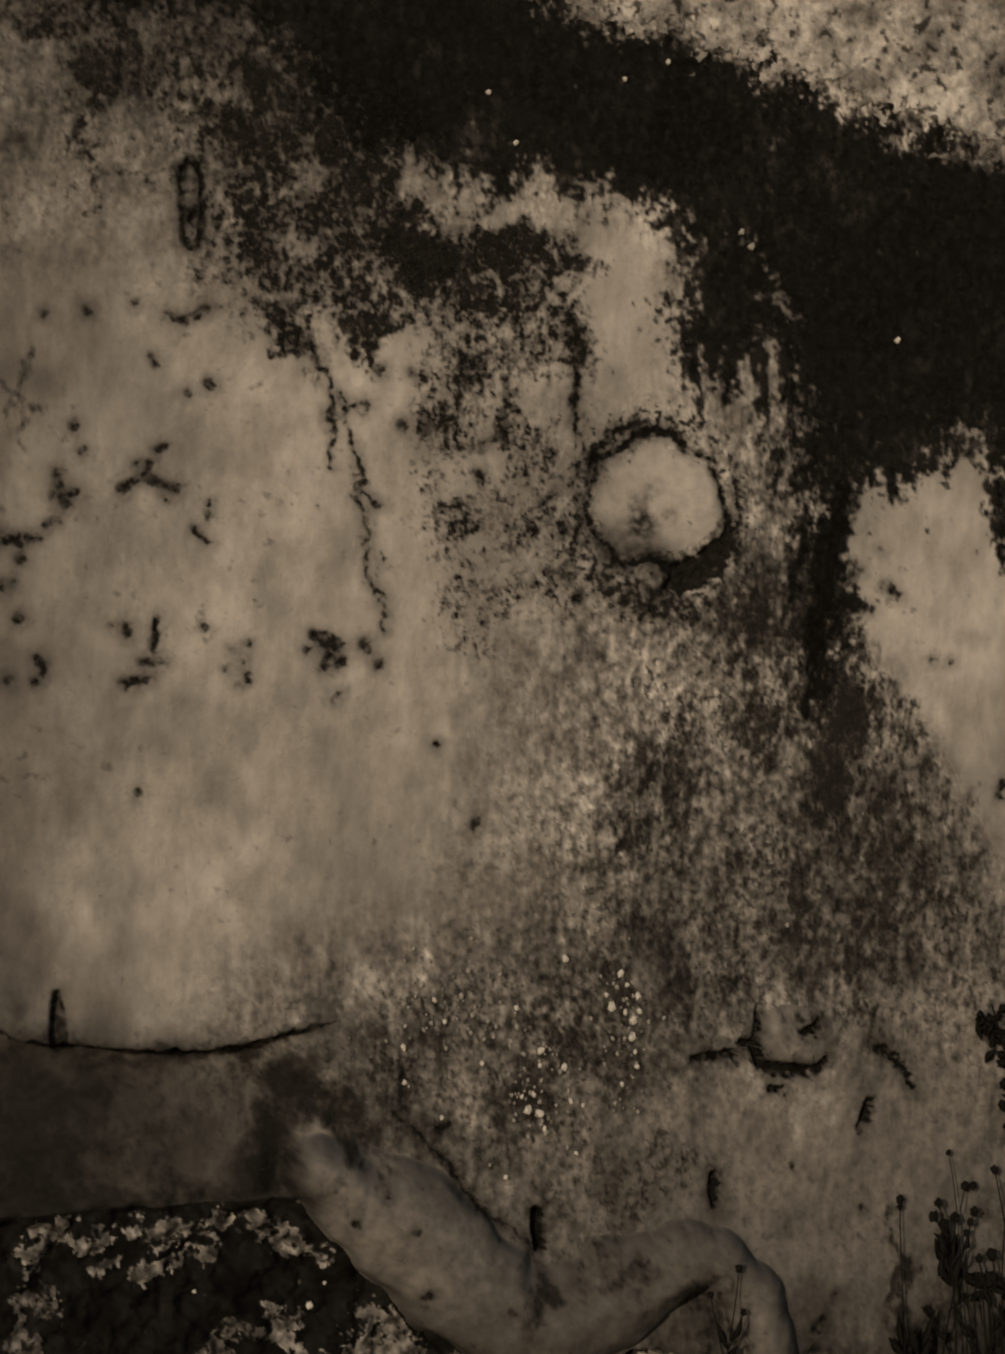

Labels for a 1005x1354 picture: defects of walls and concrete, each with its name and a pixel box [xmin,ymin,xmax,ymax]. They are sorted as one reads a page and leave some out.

crack [315,356,387,632]
damp [7,0,1005,1031]
crack [67,1021,336,1054]
damp [0,972,495,1220]
damp [488,887,723,1143]
crack [872,1042,916,1089]